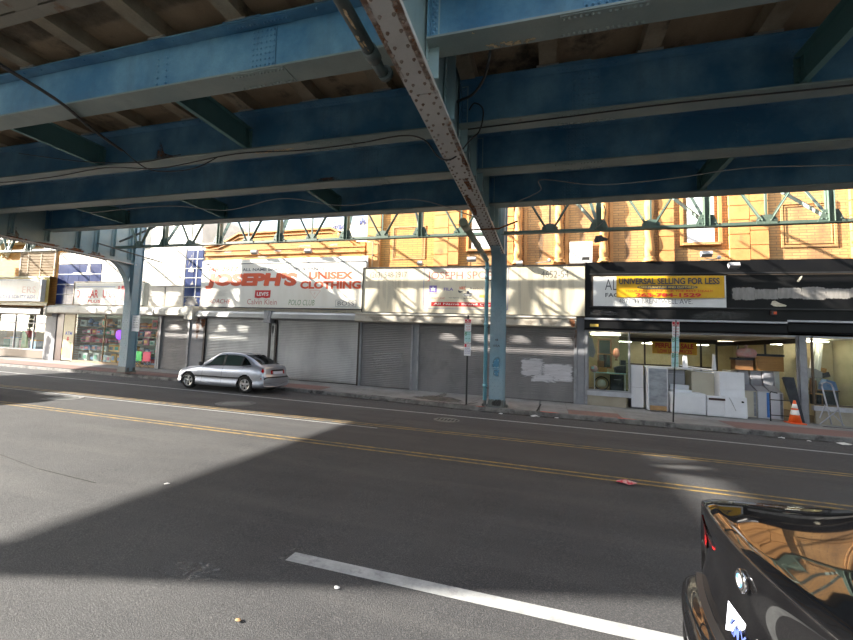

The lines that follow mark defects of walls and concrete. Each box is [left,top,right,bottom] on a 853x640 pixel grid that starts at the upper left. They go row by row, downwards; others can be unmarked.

rust [393,0,435,90]
rust [449,130,477,216]